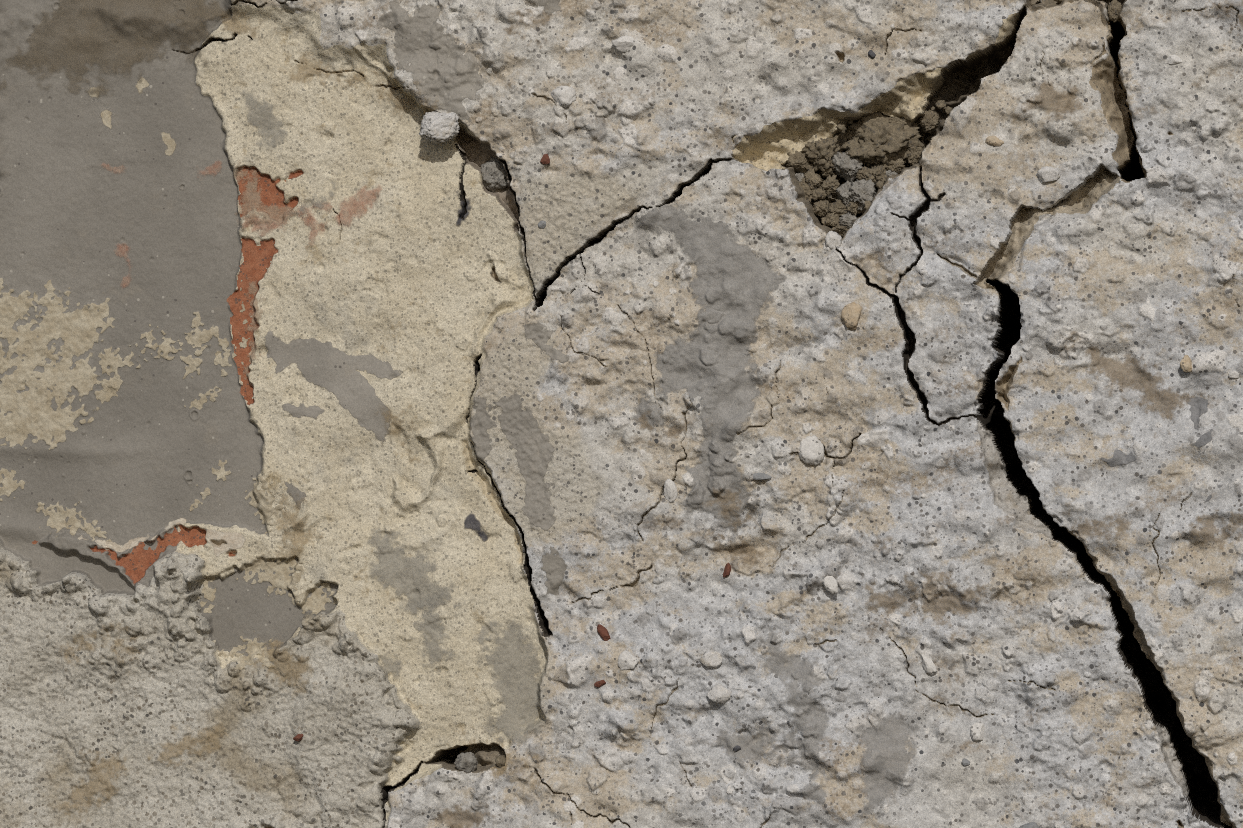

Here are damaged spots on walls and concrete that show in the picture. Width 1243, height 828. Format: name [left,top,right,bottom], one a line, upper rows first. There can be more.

peeling [246,94,287,146]
peeling [233,166,333,224]
crack [455,144,468,221]
flaking render [781,111,927,244]
peeling [0,238,403,460]
crack [462,5,1243,828]
peeling [0,468,25,501]
peeling [32,460,339,621]
peeling [218,631,275,670]
peeling [368,530,456,670]
peeling [423,621,543,773]
crack [380,762,424,828]